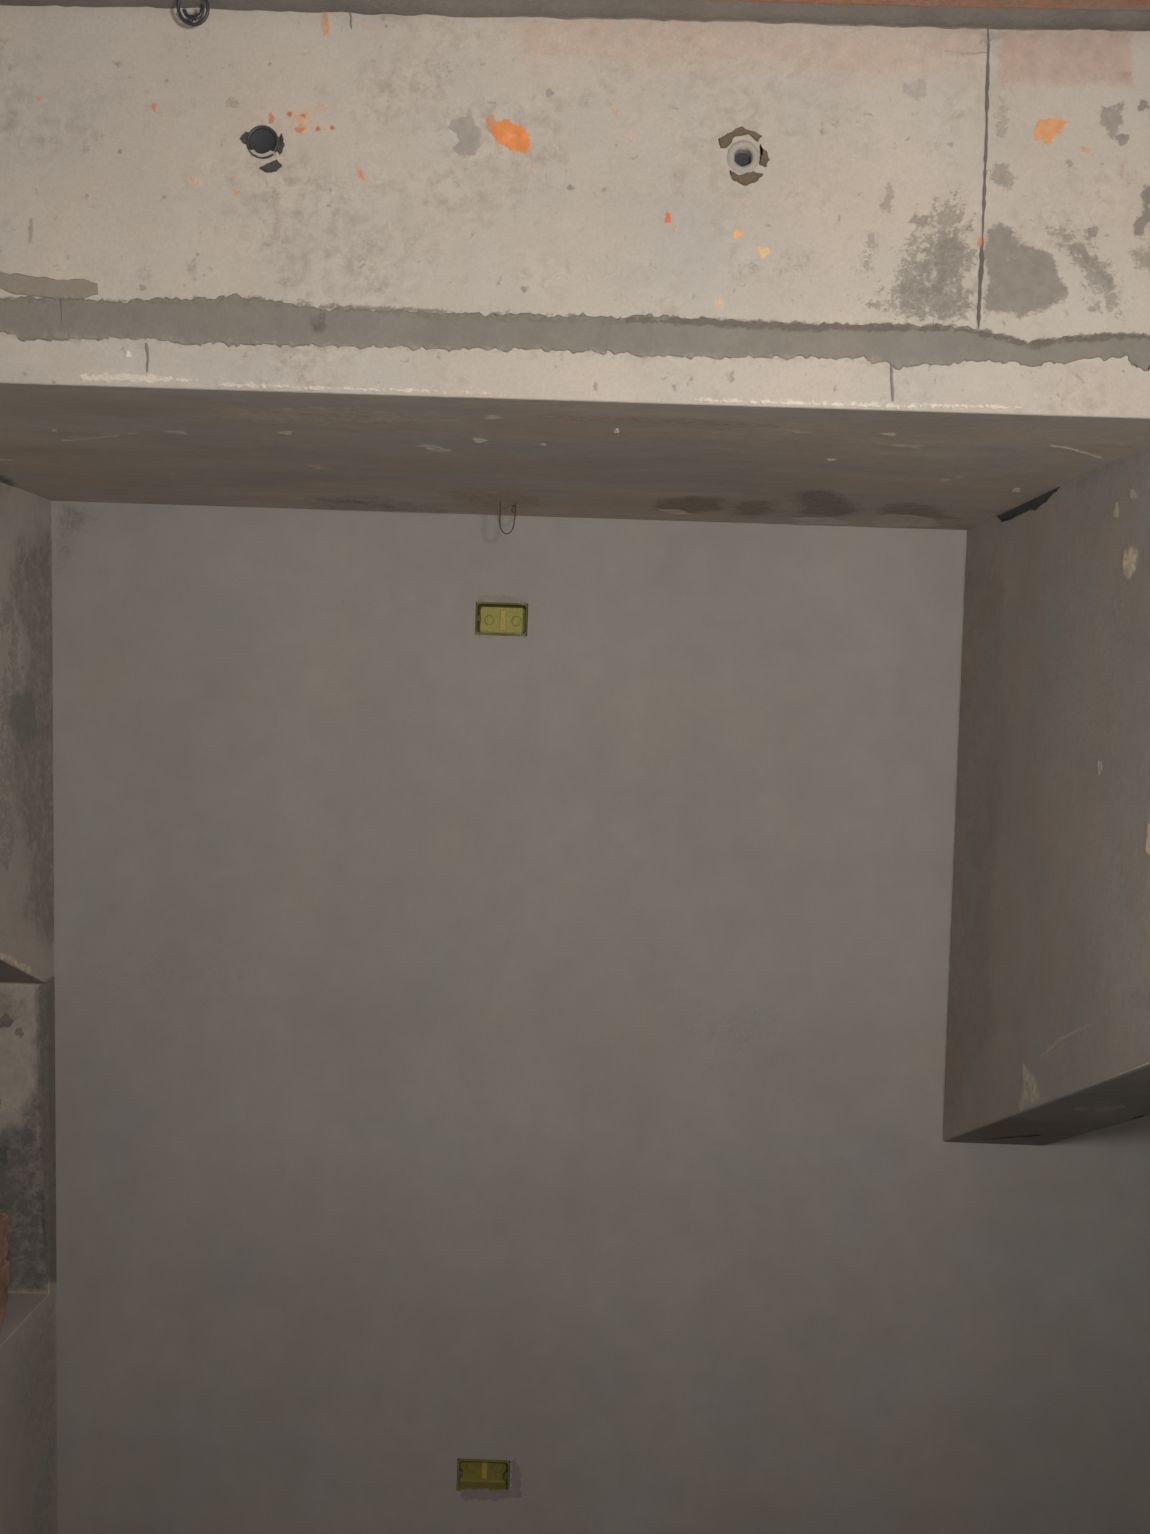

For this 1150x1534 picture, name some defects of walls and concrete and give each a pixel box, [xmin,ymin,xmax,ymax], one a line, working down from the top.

corrosion [486,115,530,153]
crack [944,28,990,328]
damp [657,497,776,515]